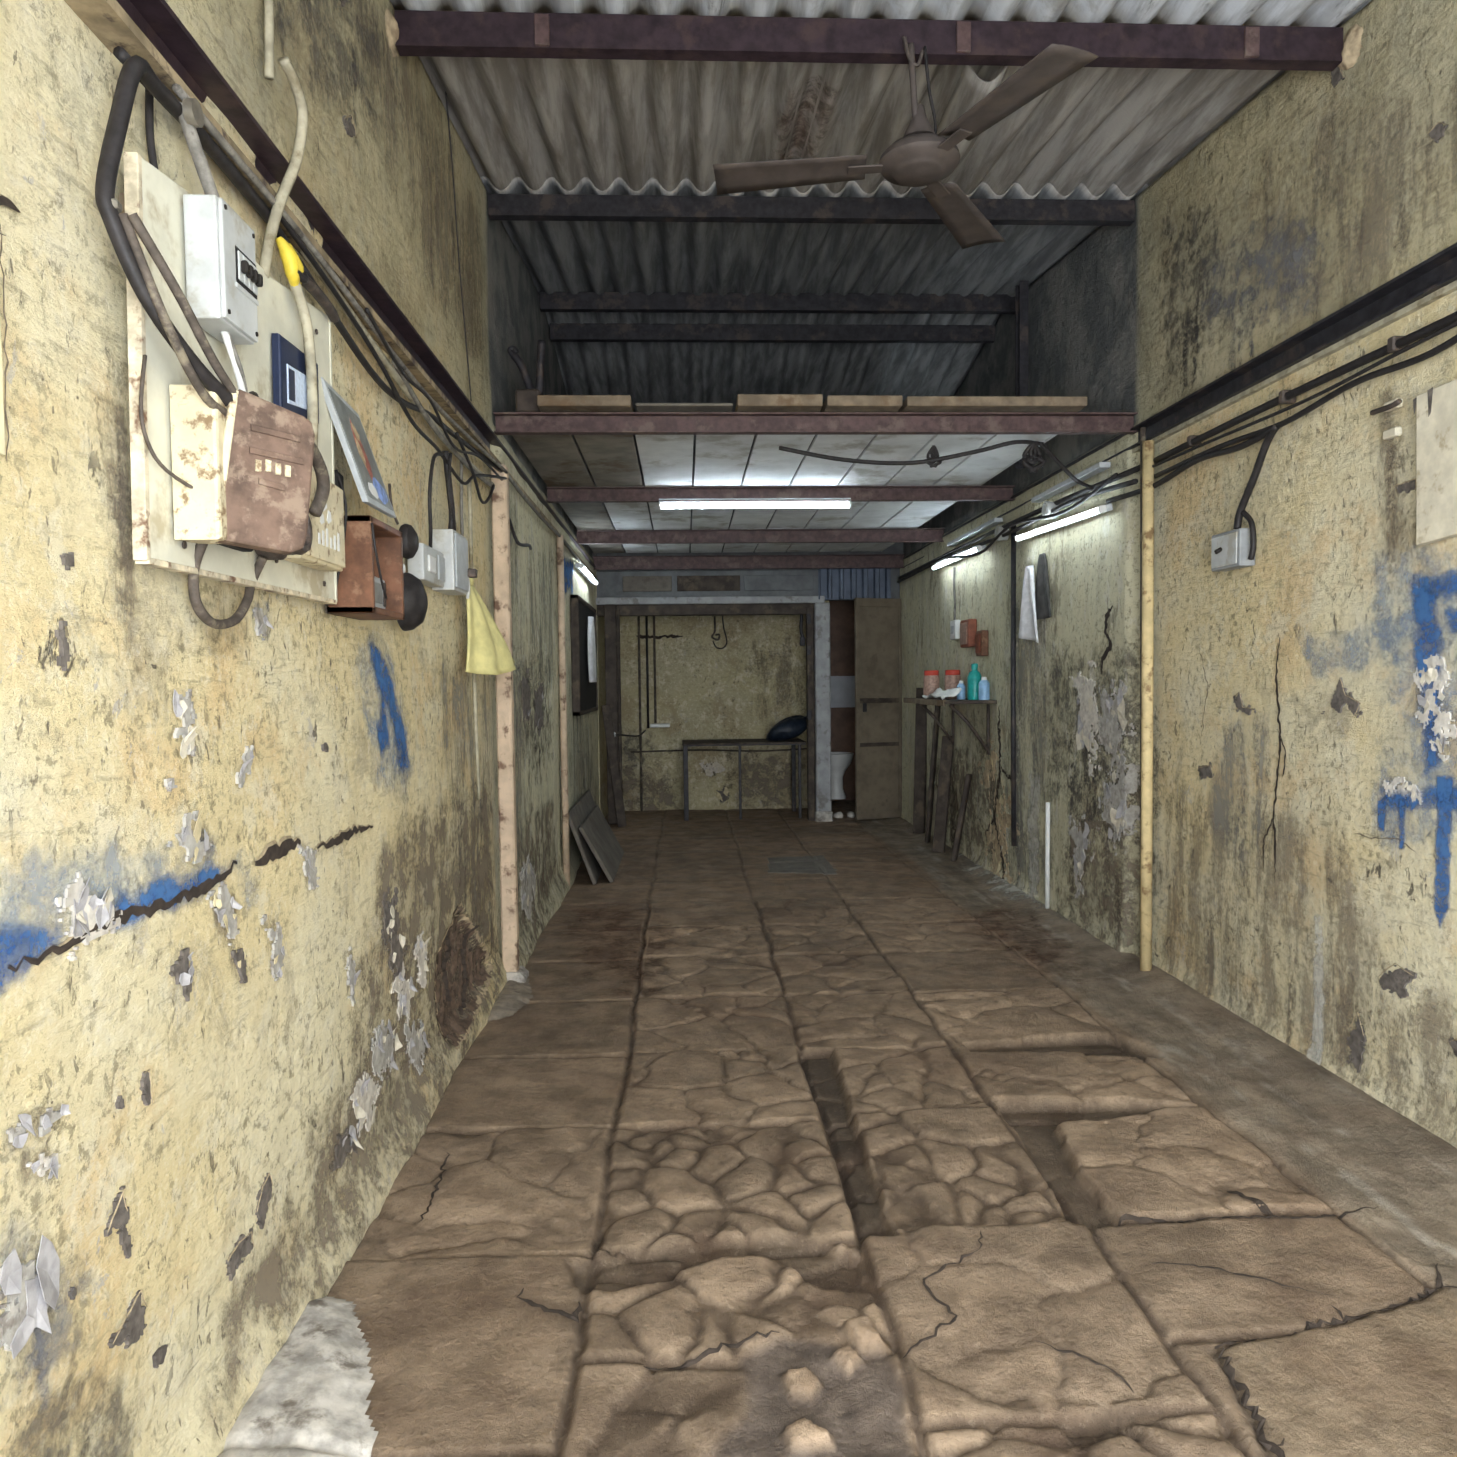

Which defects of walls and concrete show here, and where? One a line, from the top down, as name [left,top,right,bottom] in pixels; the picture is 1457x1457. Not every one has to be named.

water stain [274,0,481,350]
water stain [1162,79,1457,390]
peeling [1413,654,1457,777]
crack [8,824,373,972]
water stain [223,506,567,1400]
spalling [329,887,494,1171]
water stain [935,605,1368,1085]
water stain [1383,1003,1457,1146]
peeling [0,1235,77,1359]
crack [903,1230,983,1358]
crack [1035,1340,1134,1393]
crack [1153,1262,1457,1457]